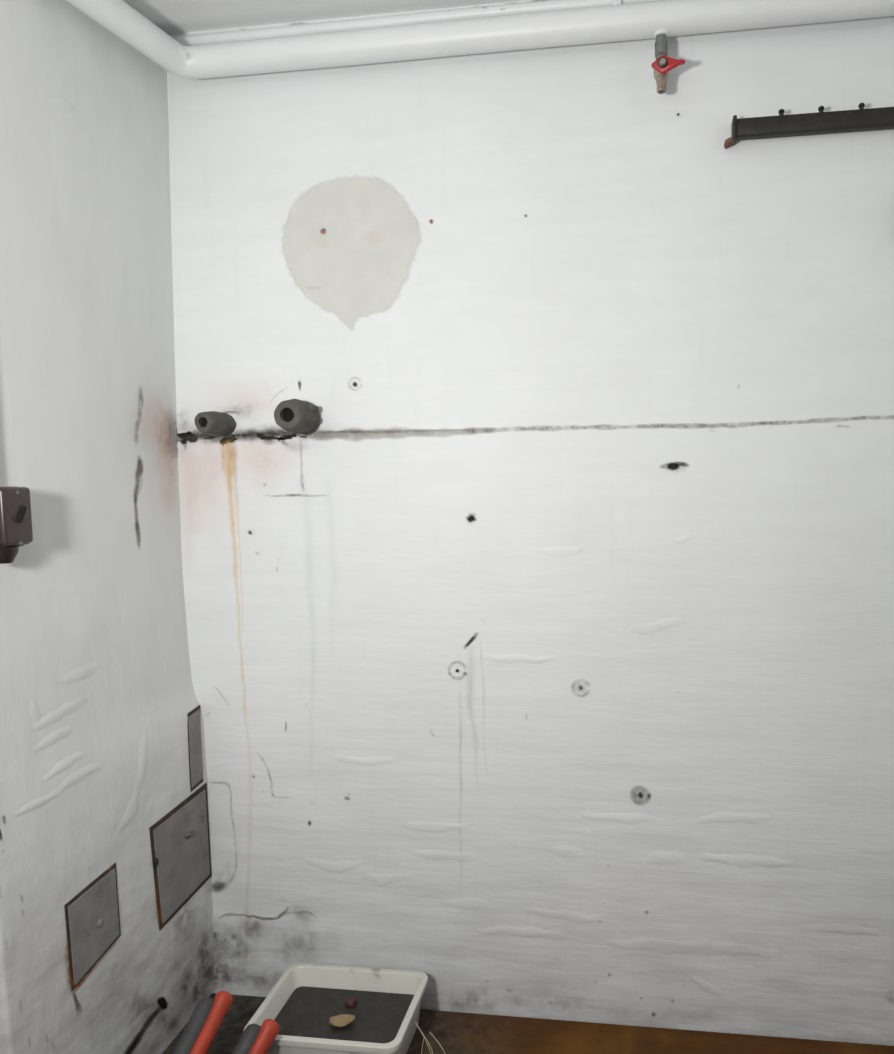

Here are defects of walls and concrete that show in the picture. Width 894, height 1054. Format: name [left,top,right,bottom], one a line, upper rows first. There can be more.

peeling [282,176,421,329]
crack [179,431,419,439]
crack [638,422,728,430]
crack [134,459,142,542]